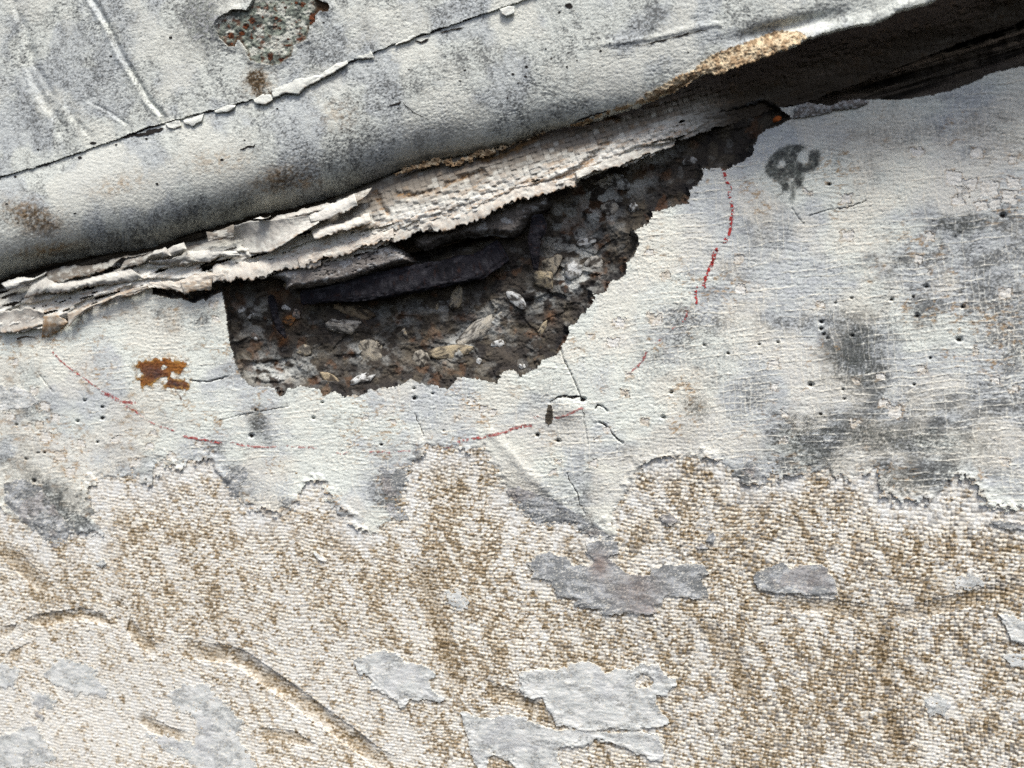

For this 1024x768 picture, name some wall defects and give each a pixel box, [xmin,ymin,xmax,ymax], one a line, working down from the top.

crack [0,4,515,178]
spalling [153,98,869,403]
corrosion [135,358,190,400]
crack [552,351,623,444]
peeling [0,429,1024,768]